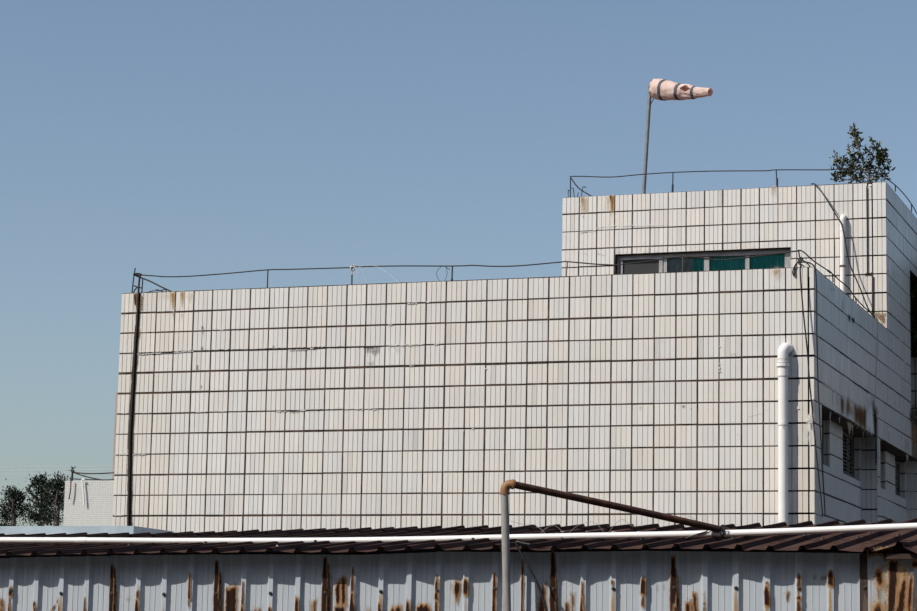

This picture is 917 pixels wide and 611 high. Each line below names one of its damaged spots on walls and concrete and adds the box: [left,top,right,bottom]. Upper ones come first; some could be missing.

rust [841,396,866,429]
rust [213,560,271,611]
rust [311,557,357,611]
rust [378,576,439,611]
rust [451,578,470,607]
rust [538,550,585,611]
rust [669,556,706,611]
rust [867,547,917,611]